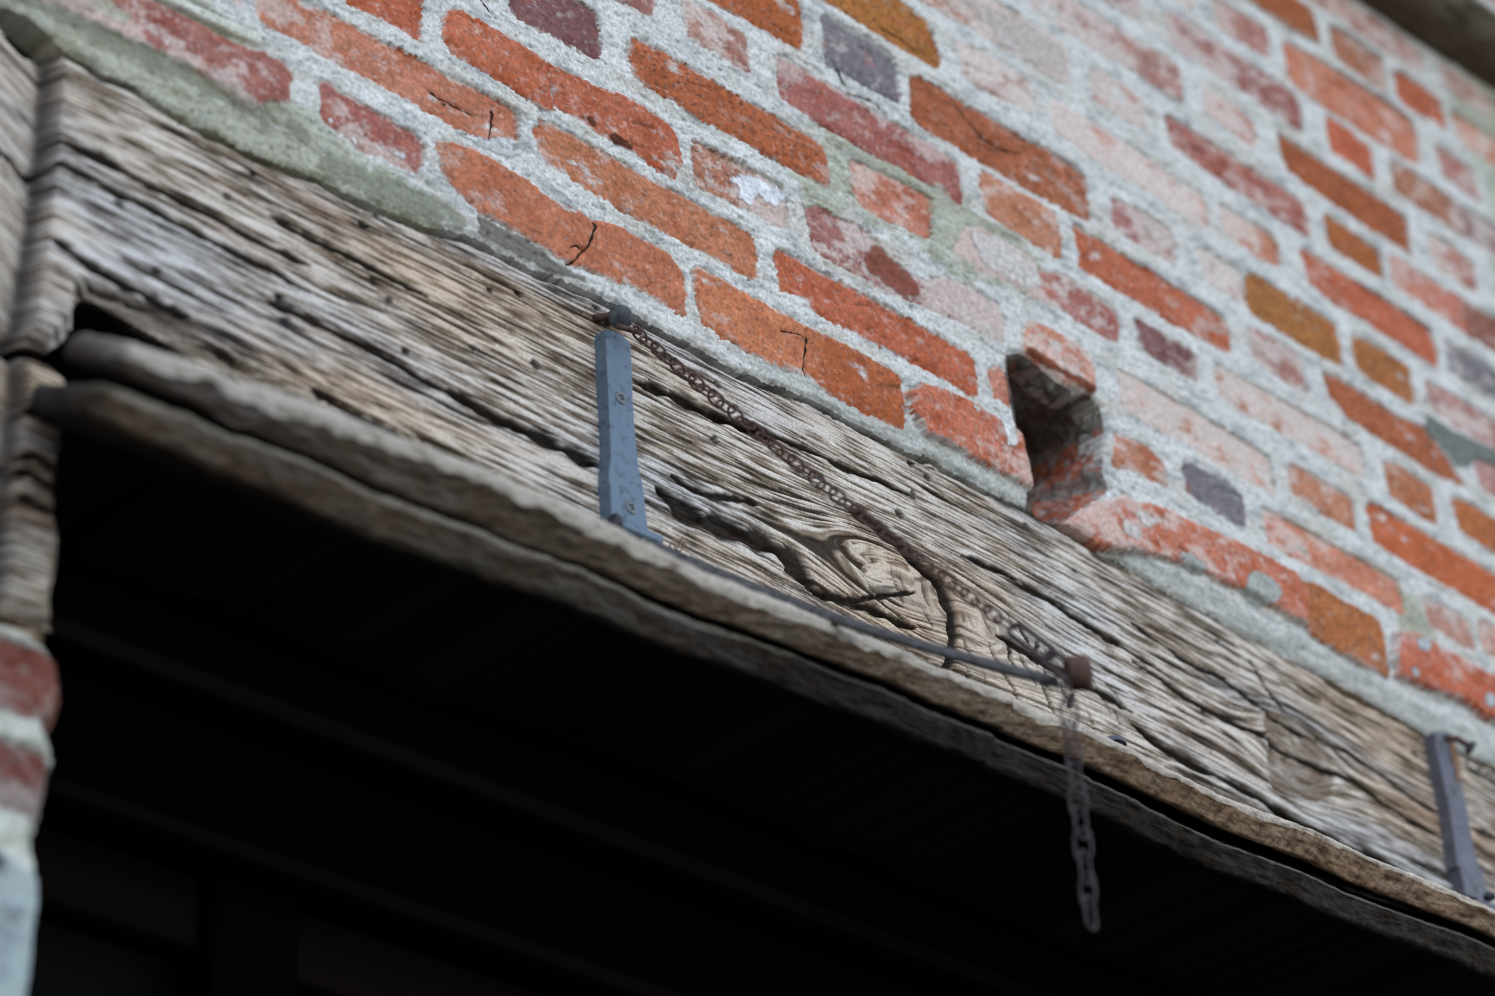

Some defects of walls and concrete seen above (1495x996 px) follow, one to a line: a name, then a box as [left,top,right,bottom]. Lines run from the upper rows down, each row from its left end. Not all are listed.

crack [565,222,597,266]
spalling [1004,347,1107,529]